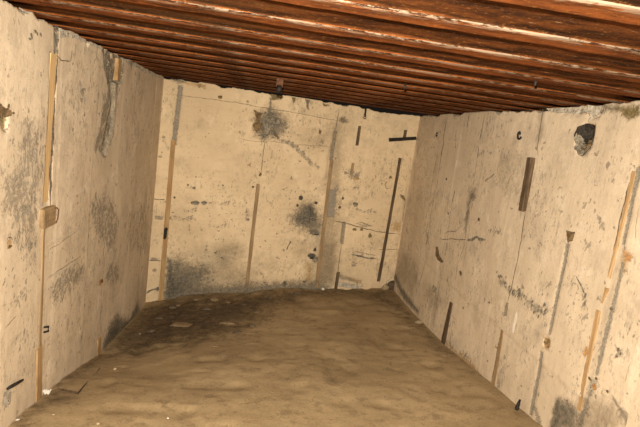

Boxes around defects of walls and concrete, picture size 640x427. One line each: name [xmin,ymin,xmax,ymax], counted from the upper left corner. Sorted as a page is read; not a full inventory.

spalling [59,29,162,158]
spalling [0,103,15,132]
mould [289,183,321,234]
water stain [165,260,328,299]
water stain [551,390,592,427]